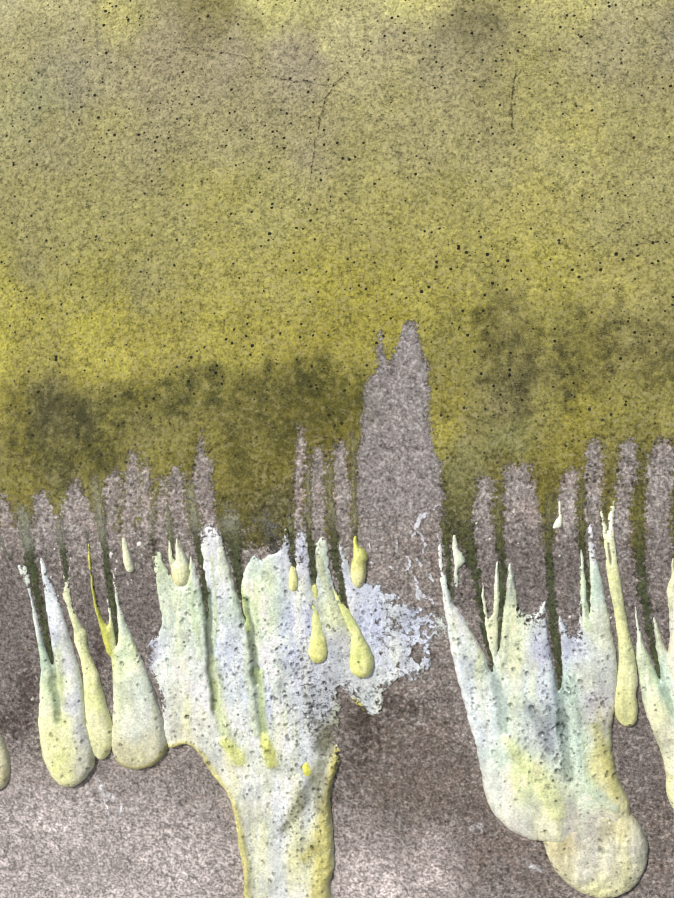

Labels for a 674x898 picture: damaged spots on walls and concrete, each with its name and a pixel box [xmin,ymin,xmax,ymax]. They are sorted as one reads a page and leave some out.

damp [0,400,162,748]
damp [186,475,210,618]
damp [219,504,246,620]
damp [260,502,297,568]
damp [305,460,317,585]
damp [326,466,347,608]
peeling [356,322,446,548]
peeling [389,555,434,605]
damp [439,479,591,690]
damp [620,480,674,678]
damp [336,699,568,898]
damp [612,692,674,898]